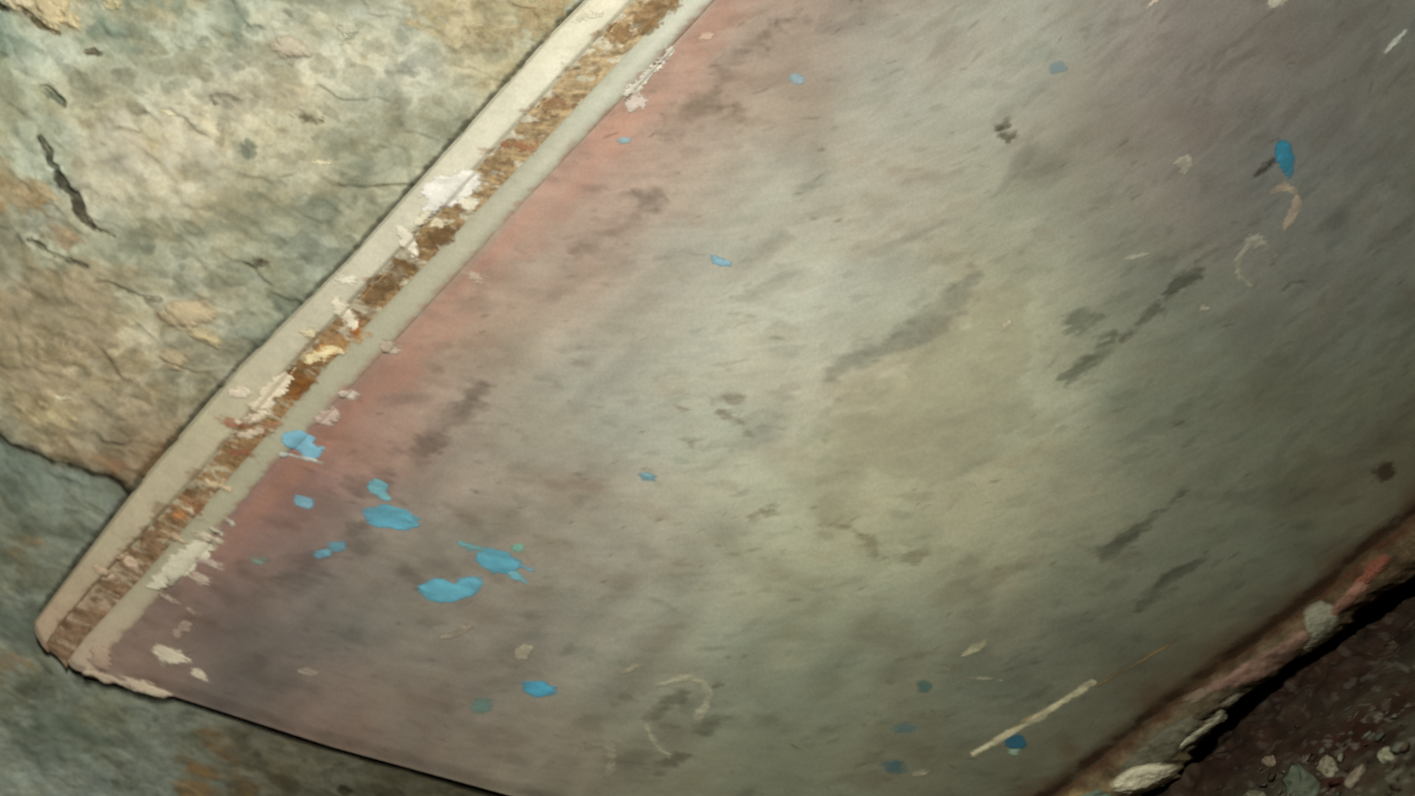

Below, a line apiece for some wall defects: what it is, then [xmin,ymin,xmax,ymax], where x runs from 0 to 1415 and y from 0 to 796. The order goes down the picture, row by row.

flaking render [406,0,601,48]
crack [44,85,66,106]
peeling [623,47,675,112]
spalling [241,140,256,158]
crack [37,136,115,236]
peeling [396,167,481,258]
crack [26,238,88,267]
peeling [331,273,359,330]
peeling [299,327,345,364]
peeling [227,372,295,439]
peeling [314,390,360,426]
peeling [0,435,510,796]